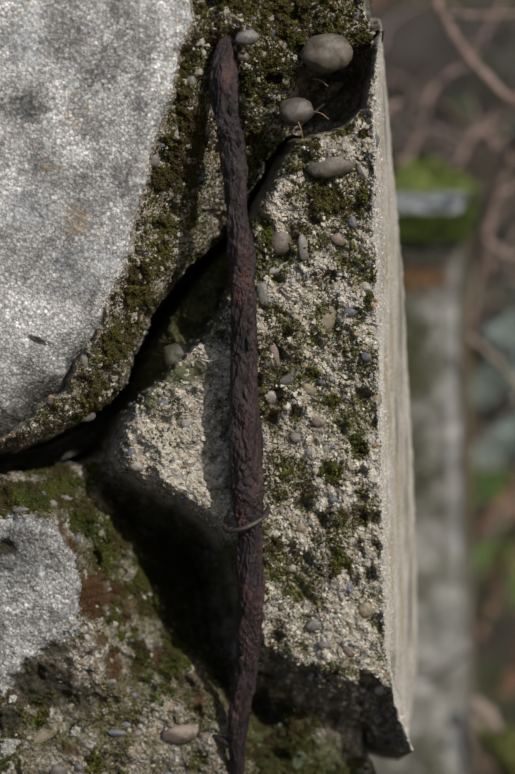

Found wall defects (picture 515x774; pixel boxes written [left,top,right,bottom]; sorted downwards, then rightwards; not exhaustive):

crack [0,337,157,470]
spalling [0,0,412,774]
corrosion [209,35,265,774]
crack [249,70,360,200]